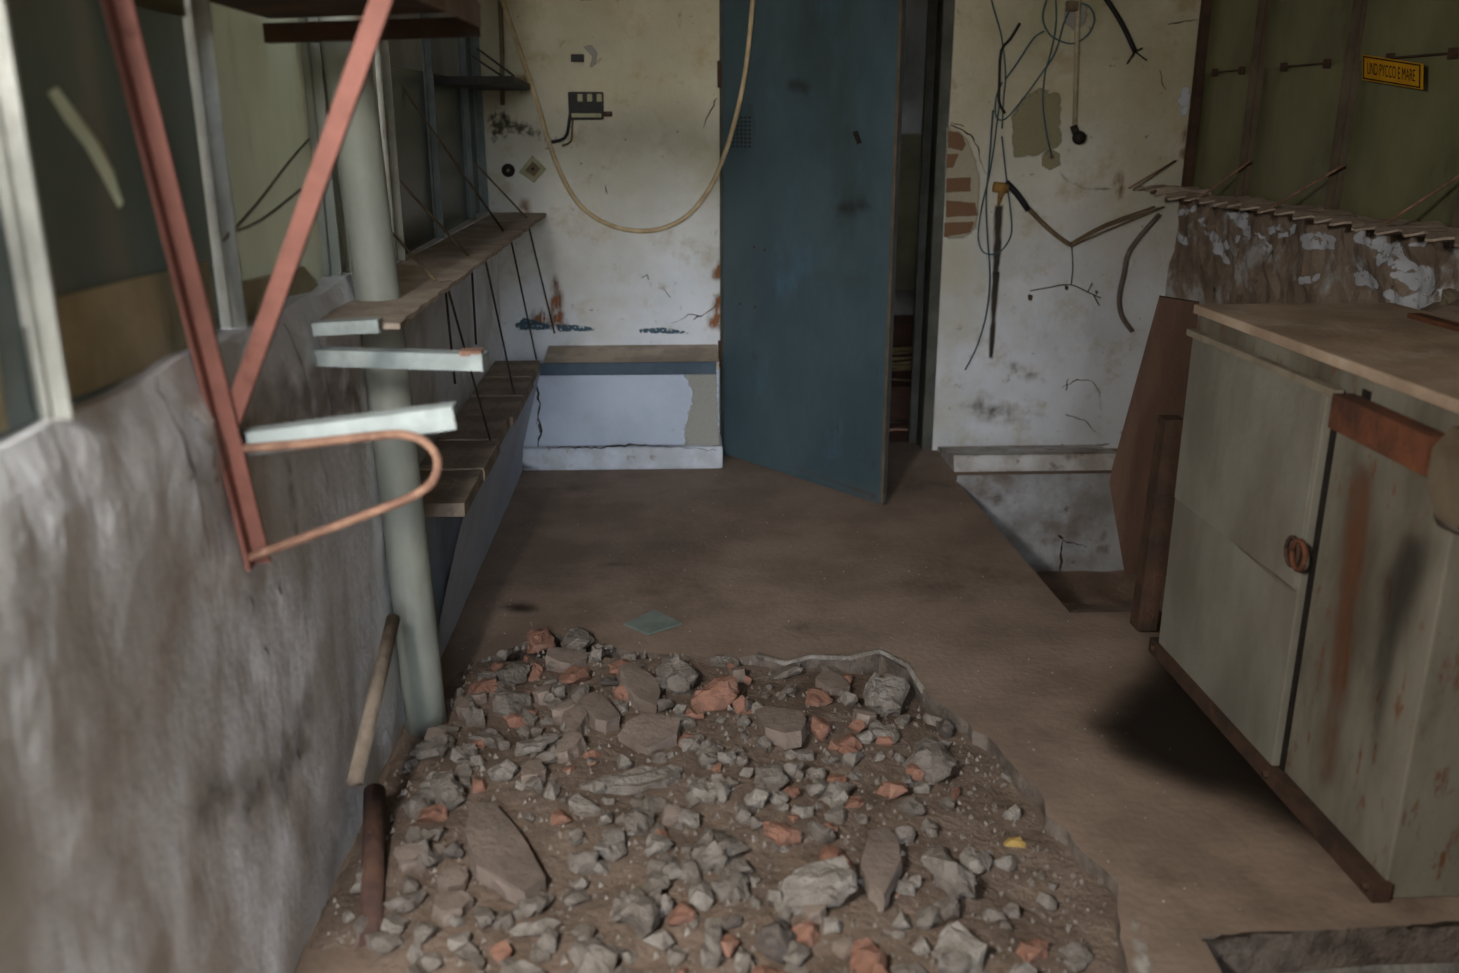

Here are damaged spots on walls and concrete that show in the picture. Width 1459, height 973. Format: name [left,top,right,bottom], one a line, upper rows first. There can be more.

flaking render [944,127,979,238]
peeling [1177,205,1457,310]
peeling [684,373,720,445]